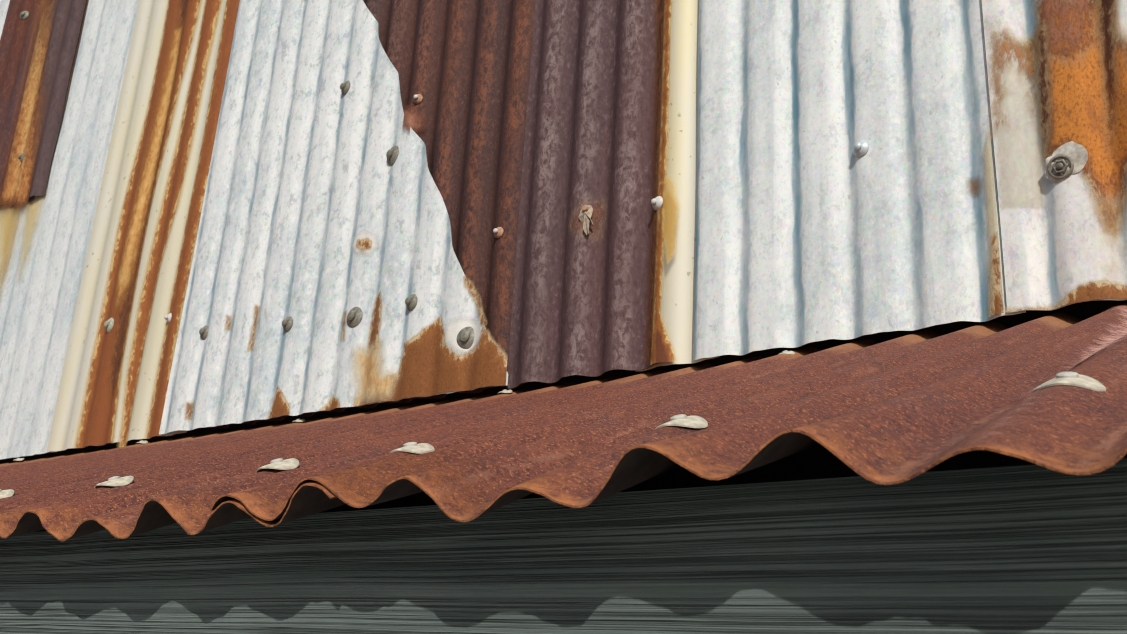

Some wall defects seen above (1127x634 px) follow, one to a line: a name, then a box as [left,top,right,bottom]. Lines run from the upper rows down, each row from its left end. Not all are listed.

rust [0,30,49,280]
rust [75,0,240,448]
rust [248,305,260,350]
rust [268,386,289,419]
rust [319,396,340,411]
rust [352,230,378,254]
rust [354,276,508,406]
rust [647,0,678,365]
rust [984,134,1127,317]
rust [1037,0,1127,234]